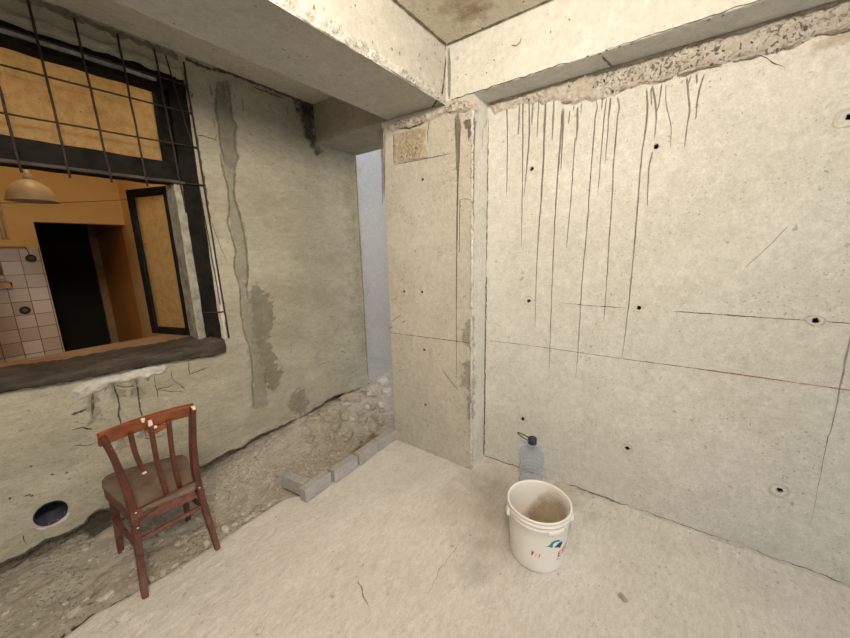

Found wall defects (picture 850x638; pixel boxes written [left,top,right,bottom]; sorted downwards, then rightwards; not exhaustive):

peeling [0,6,184,80]
spalling [586,0,760,67]
damp [287,101,320,155]
damp [684,75,704,144]
peeling [208,218,228,340]
damp [210,81,282,404]
damp [518,101,582,340]
damp [578,98,620,343]
damp [623,85,672,348]
peeling [72,363,169,403]
crack [71,361,209,446]
flaking render [0,507,111,564]